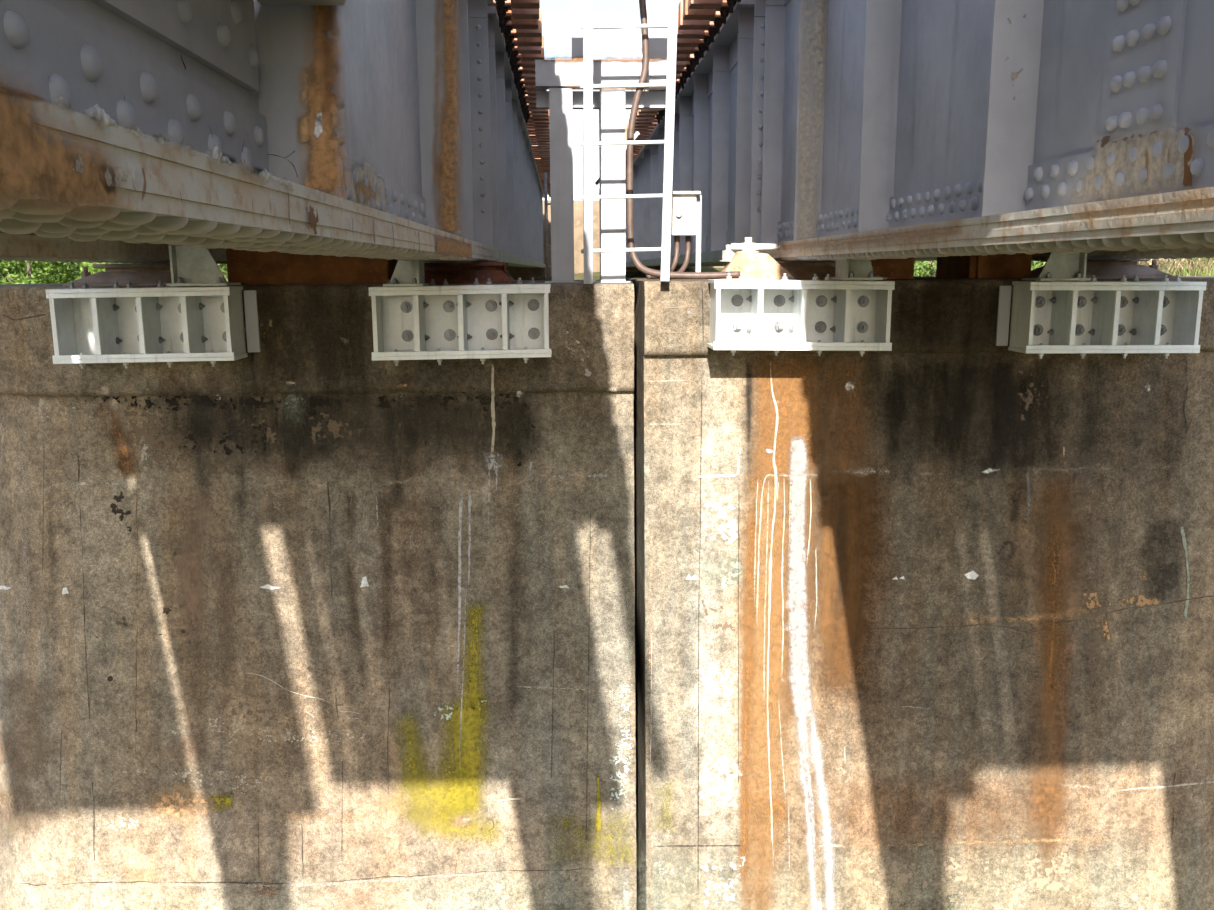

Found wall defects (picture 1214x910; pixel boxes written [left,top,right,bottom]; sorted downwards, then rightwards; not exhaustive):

corrosion [0,81,117,208]
corrosion [299,5,343,196]
corrosion [436,0,472,257]
corrosion [1078,128,1194,227]
water stain [988,290,999,342]
water stain [84,293,536,528]
water stain [878,361,1065,512]
water stain [188,558,363,729]
water stain [457,490,472,730]
corrosion [741,362,873,910]
corrosion [1083,592,1159,609]
water stain [1148,521,1190,619]